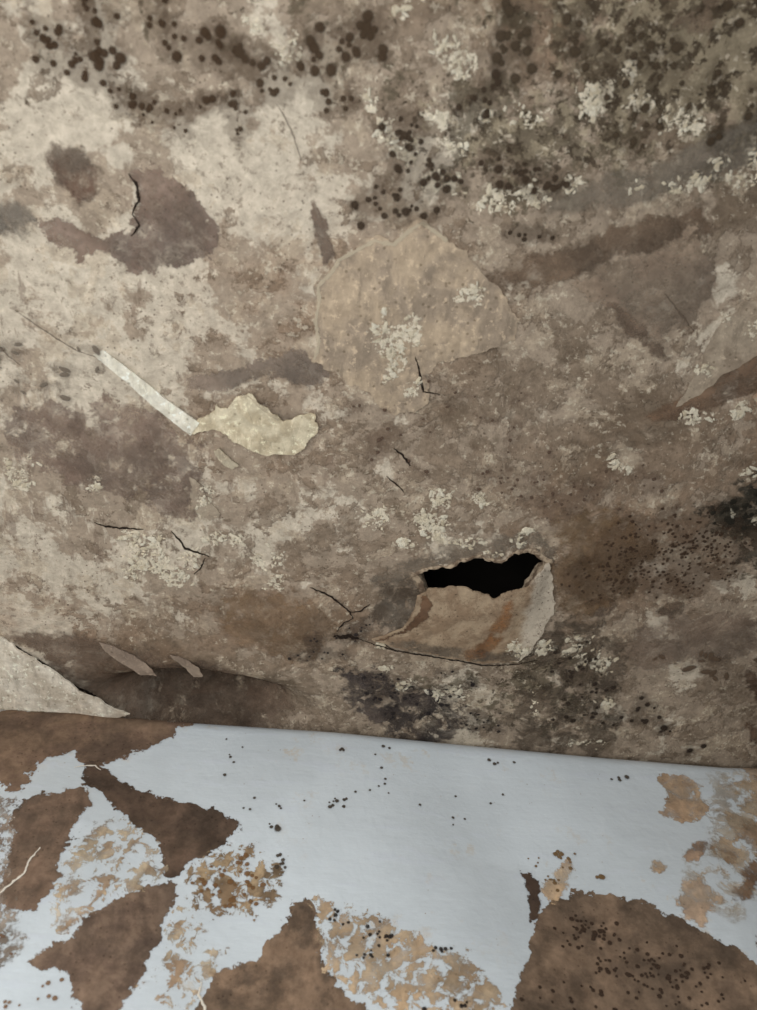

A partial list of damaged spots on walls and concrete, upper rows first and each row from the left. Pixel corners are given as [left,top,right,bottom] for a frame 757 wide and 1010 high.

leakage [29,0,187,133]
leakage [146,9,757,219]
leakage [453,208,716,308]
flaking render [93,350,319,456]
flaking render [311,218,520,416]
flaking render [676,300,757,407]
crack [94,522,144,530]
crack [171,531,209,574]
crack [310,587,537,666]
spalling [423,552,542,598]
leakage [0,633,293,1010]
leakage [195,850,757,1010]